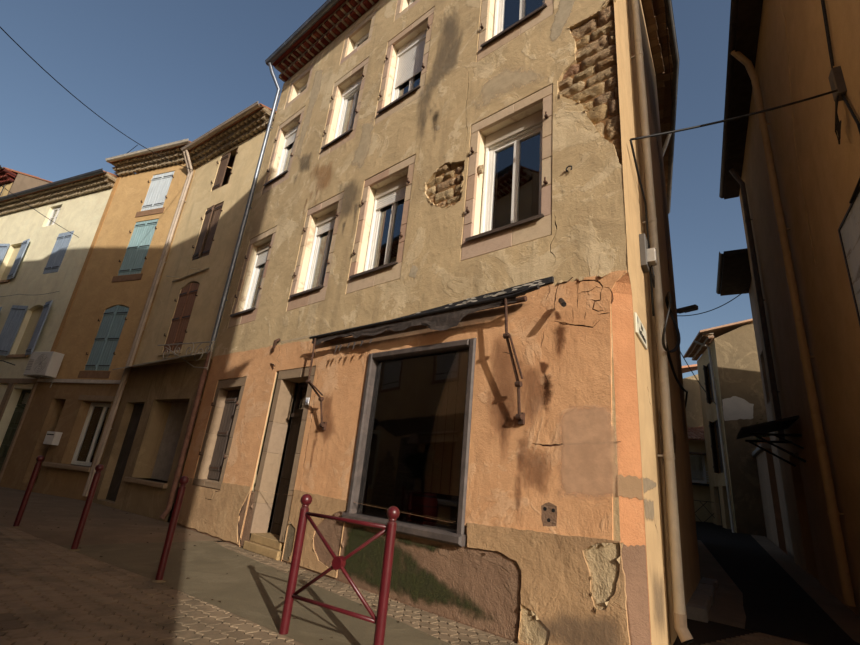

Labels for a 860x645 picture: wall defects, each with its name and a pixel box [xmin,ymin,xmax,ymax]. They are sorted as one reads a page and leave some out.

flaking render [558,1,623,167]
flaking render [424,162,483,208]
crack [541,277,614,345]
leakage [496,346,513,429]